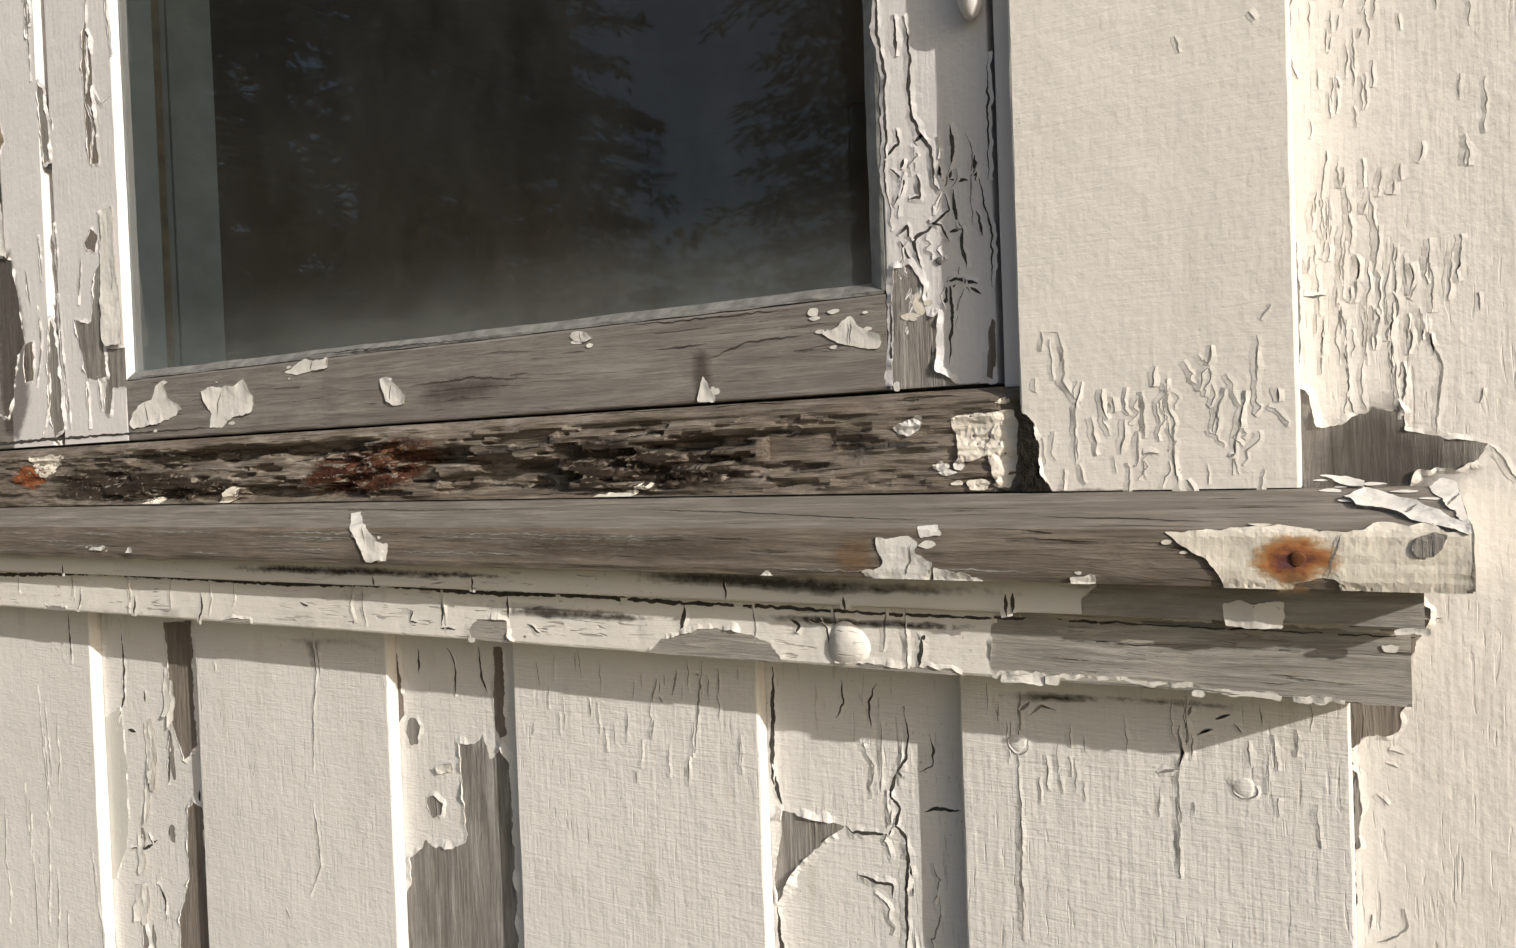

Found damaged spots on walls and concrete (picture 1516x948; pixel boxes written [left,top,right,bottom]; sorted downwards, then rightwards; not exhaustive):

peeling [0,203,181,480]
peeling [807,258,1020,490]
crack [869,0,998,366]
crack [1029,0,1516,522]
peeling [105,618,200,948]
peeling [169,796,209,948]
peeling [406,612,524,948]
peeling [862,525,984,581]
crack [931,568,1416,945]
peeling [986,383,1495,852]
rust [1252,536,1337,583]
crack [1425,614,1444,623]